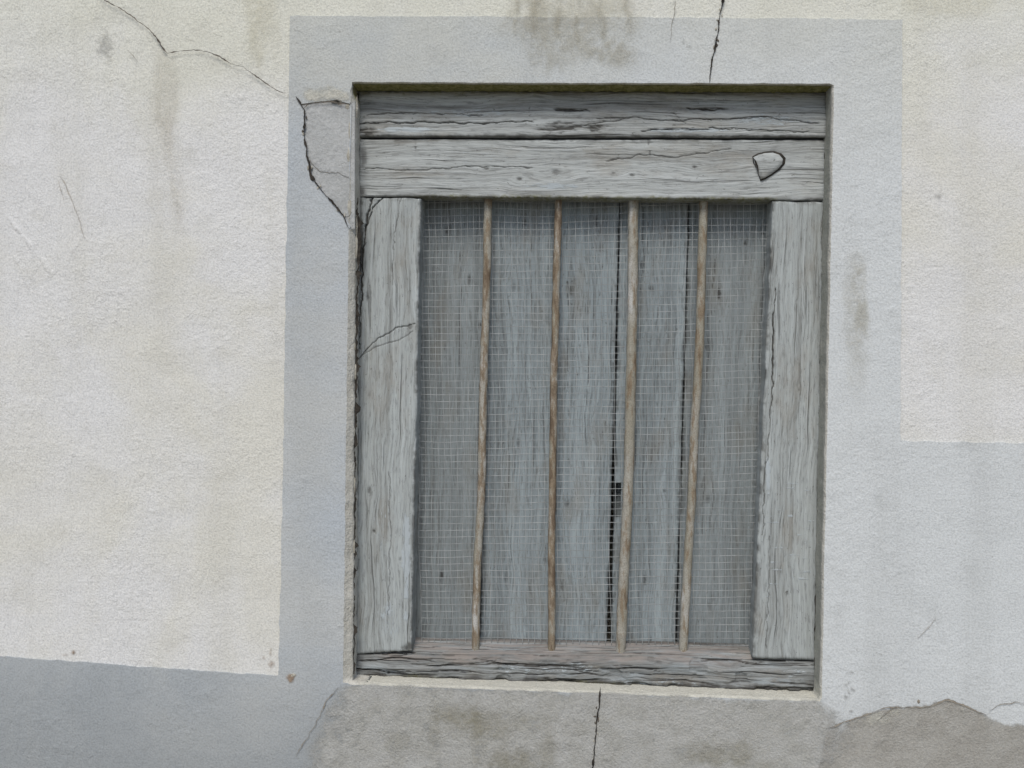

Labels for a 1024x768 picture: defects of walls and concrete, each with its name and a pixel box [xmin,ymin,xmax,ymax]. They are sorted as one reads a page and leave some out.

crack [709,0,725,78]
crack [104,0,364,756]
crack [592,687,601,768]
flaking render [313,684,1024,768]